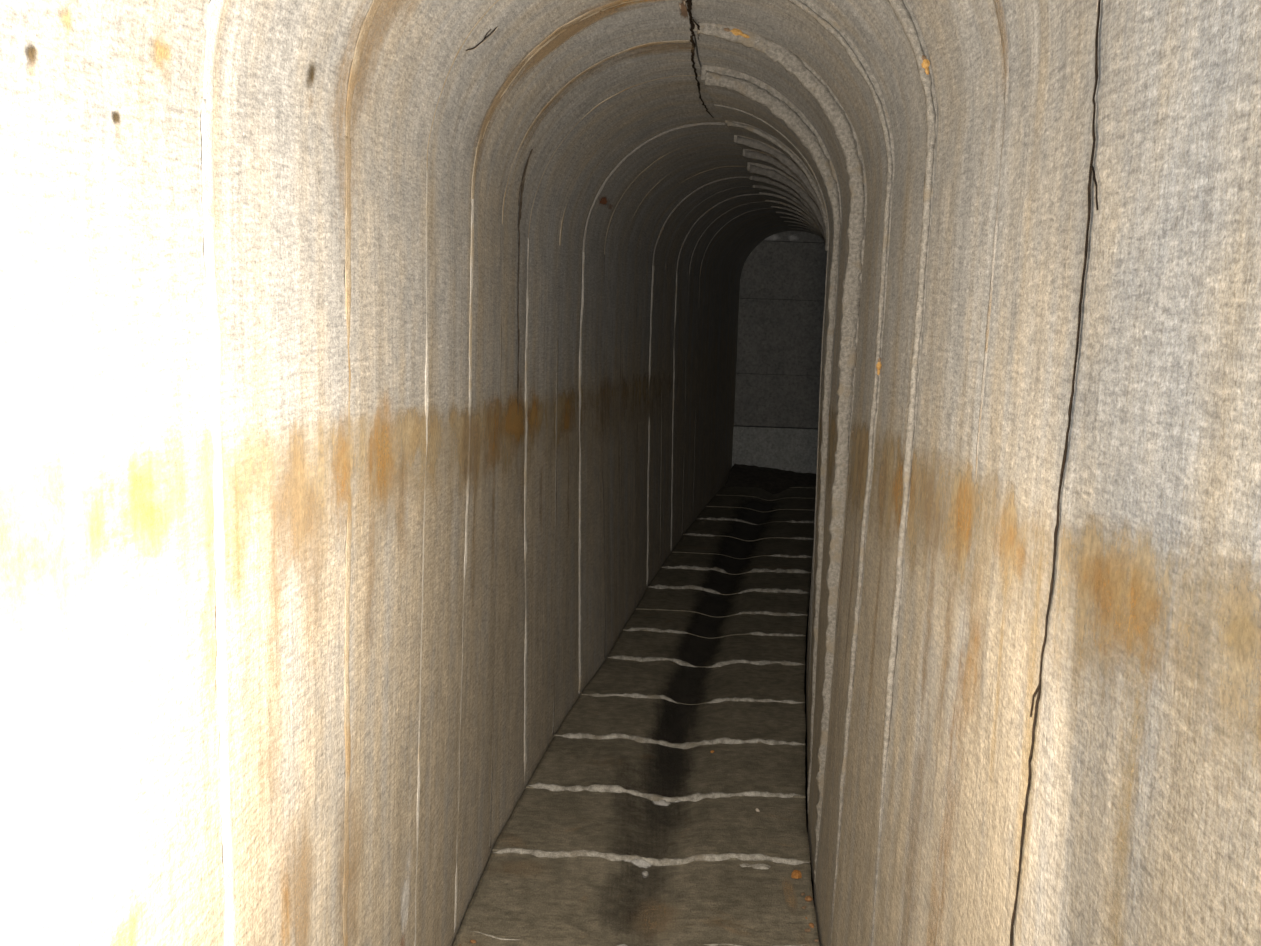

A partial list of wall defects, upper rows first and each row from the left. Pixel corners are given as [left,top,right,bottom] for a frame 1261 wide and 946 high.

crack [682,0,714,118]
rust [464,397,538,475]
crack [1010,0,1101,946]
damp [624,500,776,894]